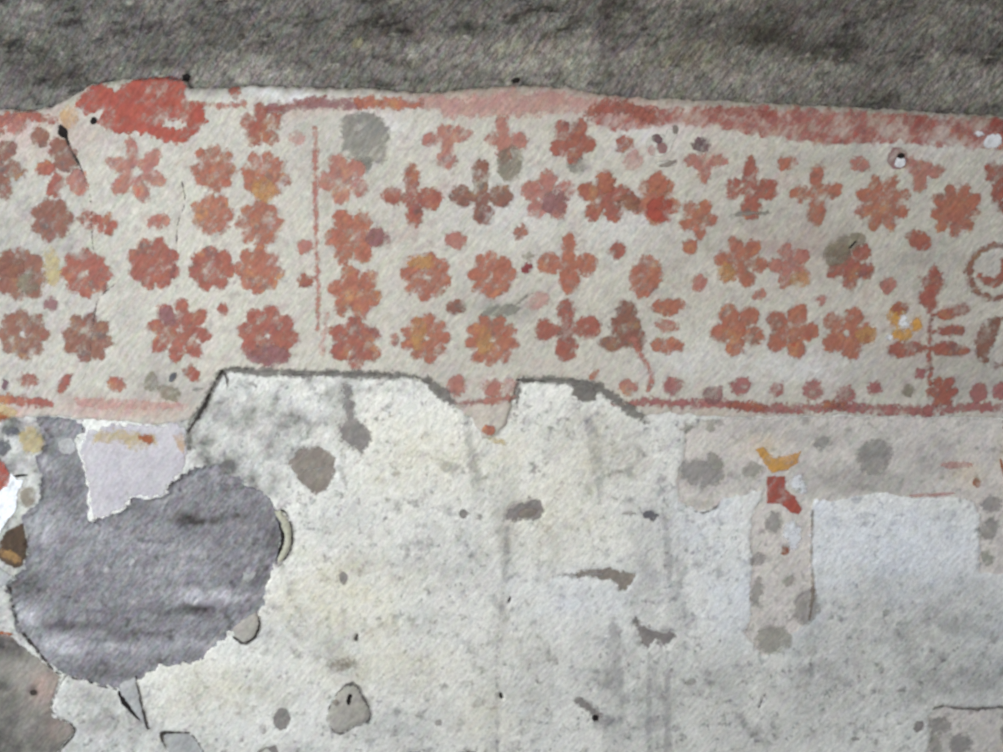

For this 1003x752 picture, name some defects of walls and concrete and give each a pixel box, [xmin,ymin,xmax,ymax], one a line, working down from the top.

peeling [185,367,455,453]
peeling [513,376,649,424]
spalling [288,446,336,495]
spalling [506,499,543,522]
spalling [623,510,659,521]
peeling [784,521,801,549]
spalling [0,417,294,752]
spalling [570,567,635,591]
spalling [633,617,675,648]
spalling [574,697,602,721]